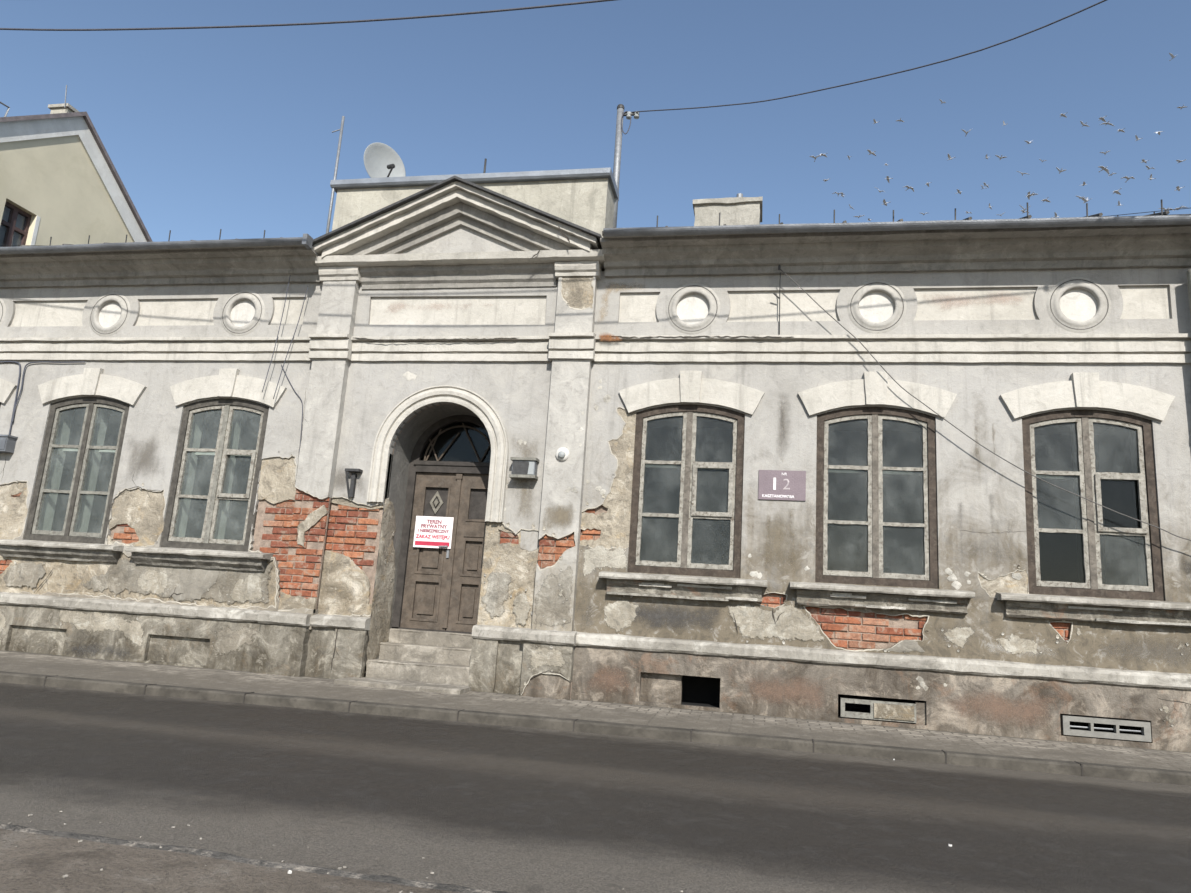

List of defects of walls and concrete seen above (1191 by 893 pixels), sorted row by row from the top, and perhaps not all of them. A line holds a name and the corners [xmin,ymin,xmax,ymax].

spalling [477,379,637,629]
spalling [0,451,396,669]
spalling [748,554,788,608]
spalling [803,605,975,652]
flaking render [996,620,1073,654]
spalling [521,645,571,700]